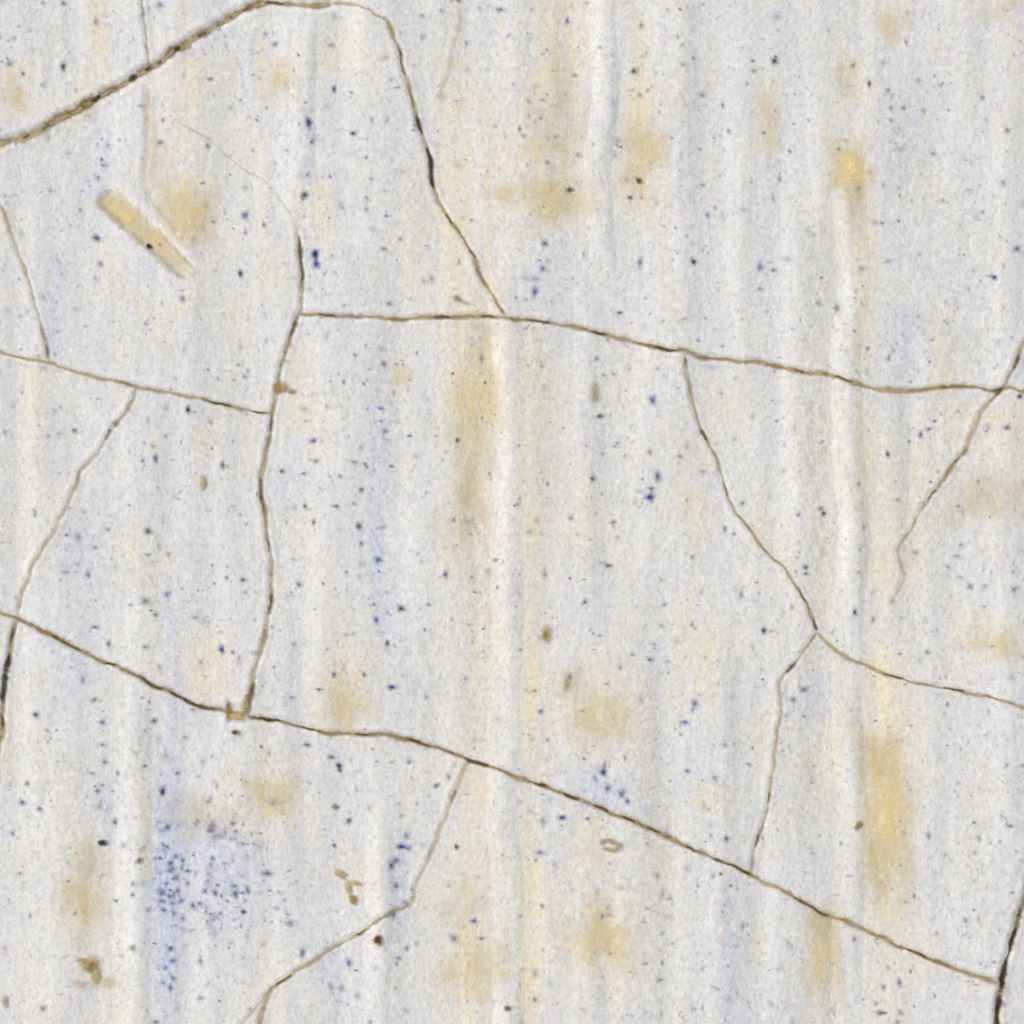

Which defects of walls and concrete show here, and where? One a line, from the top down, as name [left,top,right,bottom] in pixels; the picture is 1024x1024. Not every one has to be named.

crack [0,0,1024,742]
crack [247,710,1024,1024]